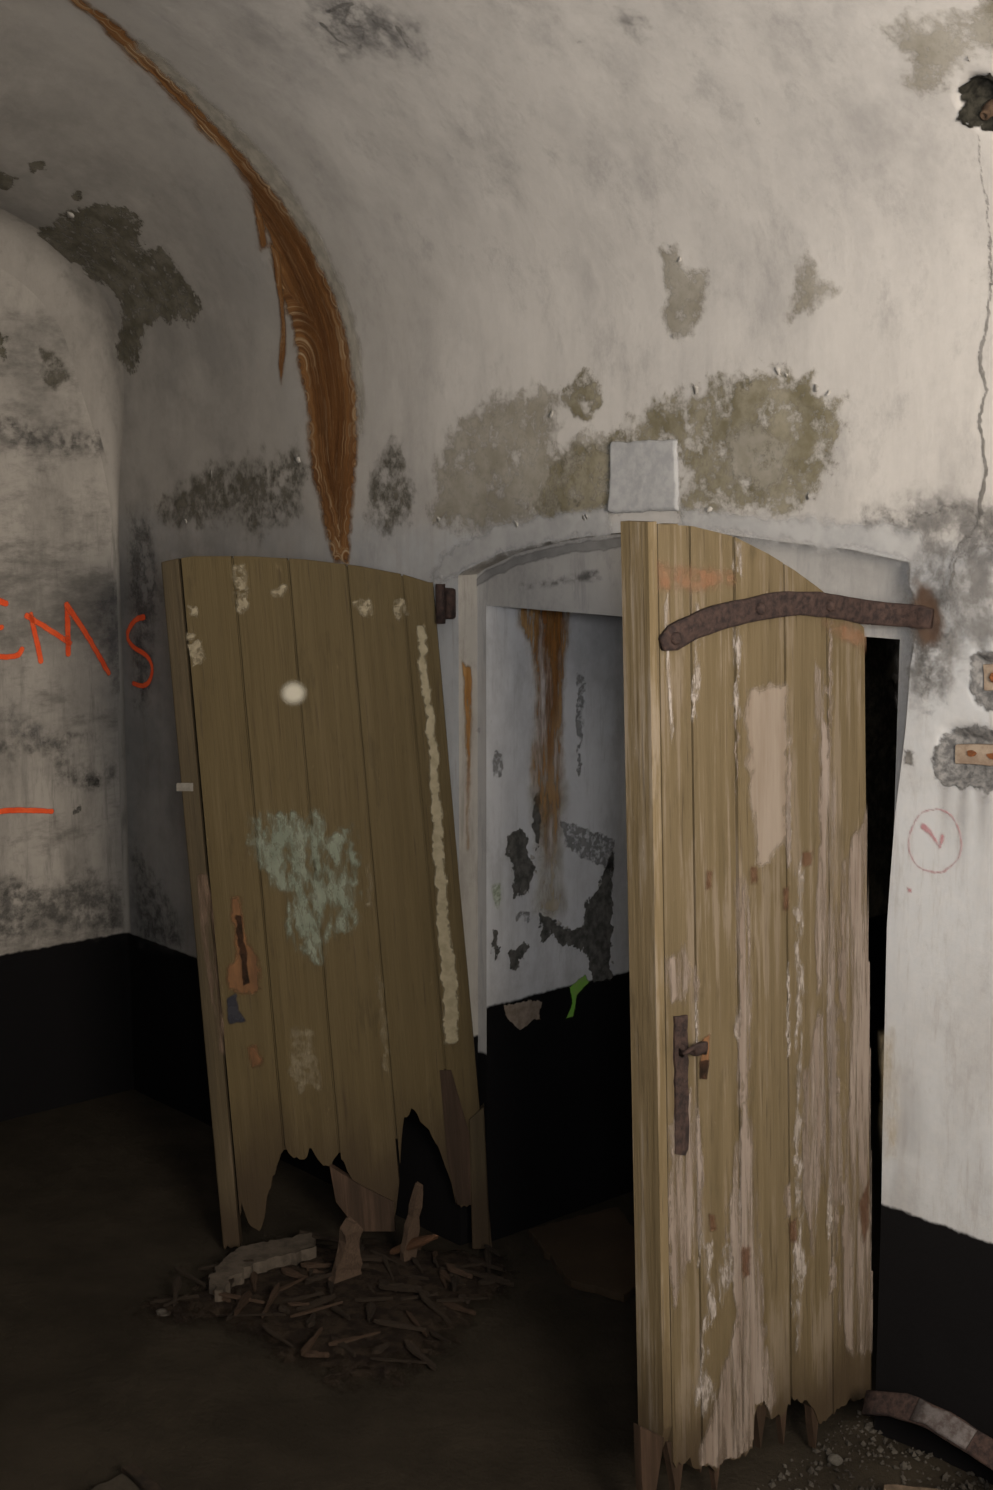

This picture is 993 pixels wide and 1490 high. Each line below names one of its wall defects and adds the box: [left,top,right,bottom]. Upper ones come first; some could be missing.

peeling [900,3,993,131]
peeling [39,349,68,388]
peeling [38,191,203,374]
rust [70,0,363,565]
crack [908,284,993,560]
water stain [910,503,993,634]
rust [519,608,569,910]
spalling [933,651,993,794]
peeling [491,793,614,983]